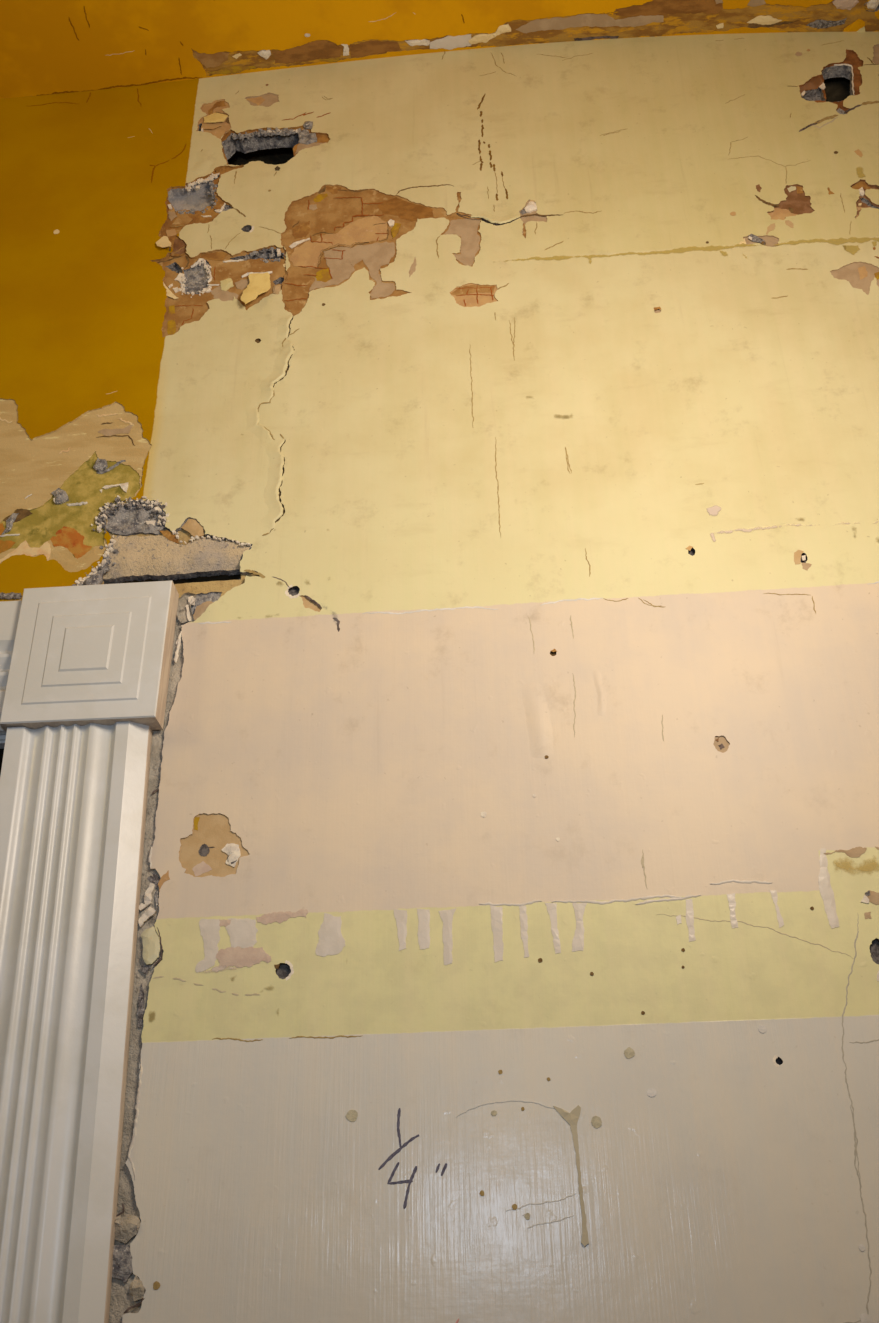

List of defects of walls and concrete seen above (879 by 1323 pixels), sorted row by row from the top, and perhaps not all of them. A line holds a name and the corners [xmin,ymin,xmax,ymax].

peeling [191,0,879,114]
peeling [150,99,482,337]
crack [457,211,601,226]
peeling [739,184,815,247]
peeling [450,283,498,307]
peeling [830,262,879,295]
crack [246,314,300,536]
peeling [0,398,340,632]
peeling [138,813,249,965]
peeling [861,890,879,919]
spalling [274,960,294,981]
crack [657,913,879,1323]